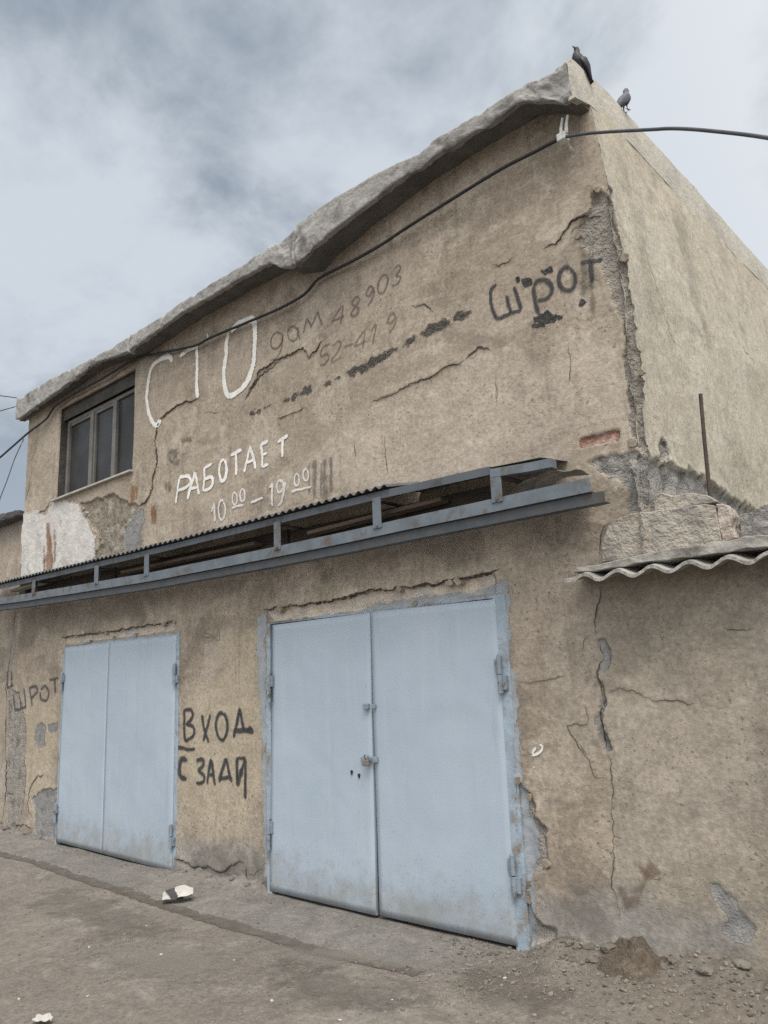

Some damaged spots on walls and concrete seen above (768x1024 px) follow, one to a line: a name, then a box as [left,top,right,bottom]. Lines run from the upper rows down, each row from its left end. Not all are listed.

crack [545,215,603,248]
crack [245,340,323,399]
crack [372,346,492,402]
spalling [574,186,750,554]
crack [139,398,216,506]
corrosion [43,524,56,571]
spalling [79,494,138,559]
crack [263,569,498,611]
spalling [594,638,612,753]
spalling [5,687,58,840]
crack [567,588,697,914]
spalling [514,777,551,905]